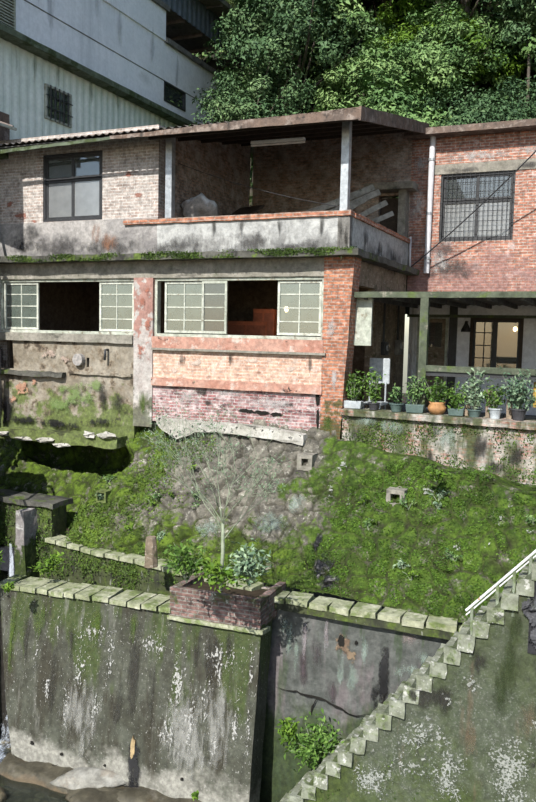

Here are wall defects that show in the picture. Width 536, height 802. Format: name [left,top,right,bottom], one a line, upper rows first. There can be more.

damp [0,381,78,428]
damp [99,388,120,409]
peeling [0,431,70,448]
peeling [83,431,116,439]
damp [474,436,486,456]
damp [128,644,139,708]
damp [371,647,389,710]
crack [276,687,385,717]
damp [122,743,139,787]